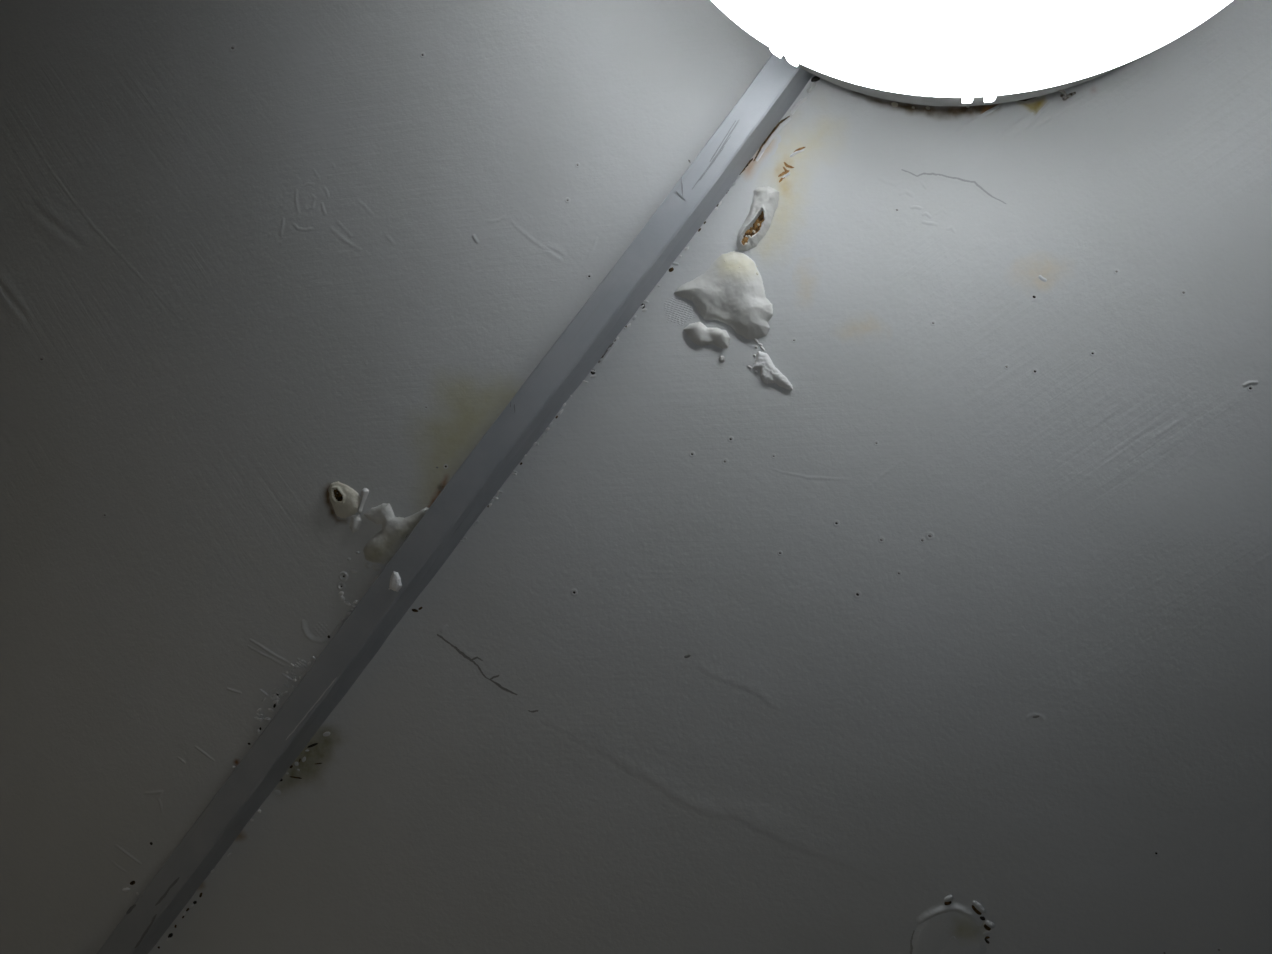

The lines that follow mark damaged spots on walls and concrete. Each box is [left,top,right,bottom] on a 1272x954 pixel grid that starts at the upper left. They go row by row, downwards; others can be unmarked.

crack [412,607,538,713]